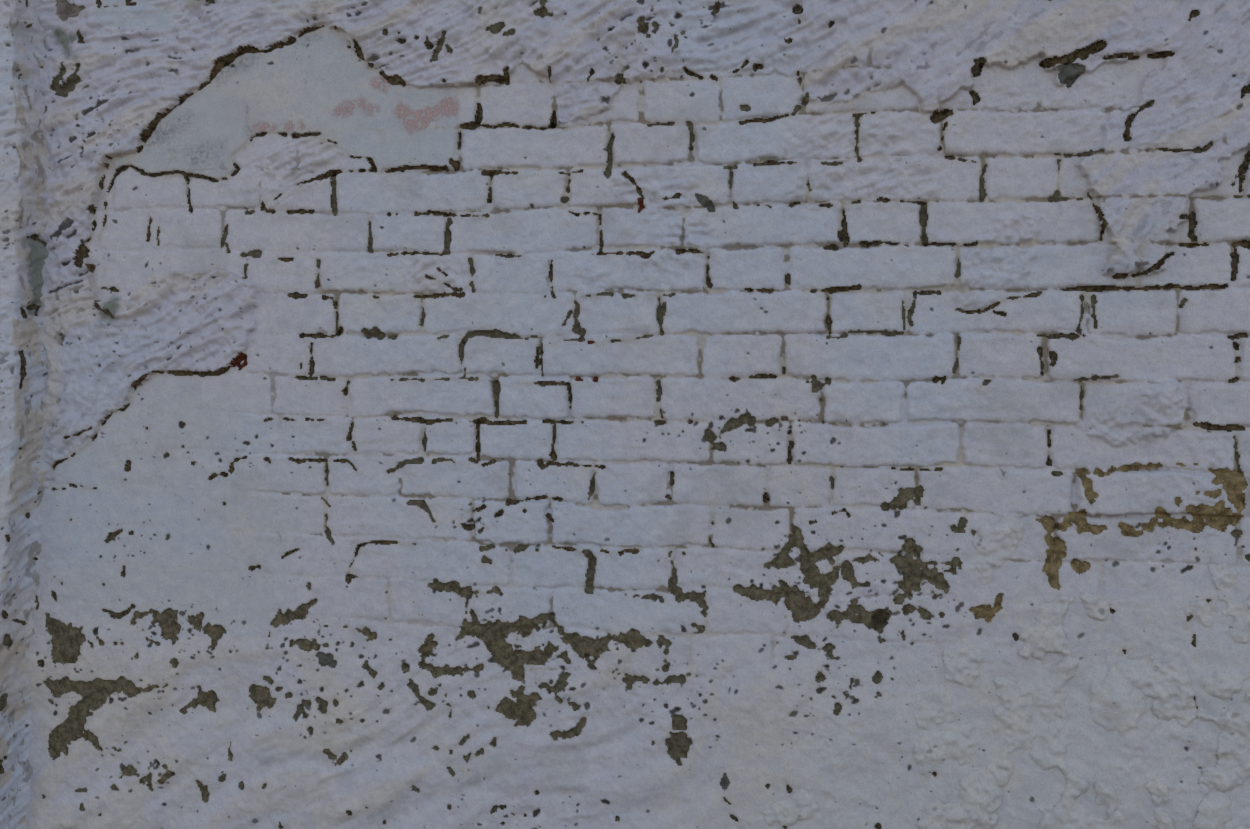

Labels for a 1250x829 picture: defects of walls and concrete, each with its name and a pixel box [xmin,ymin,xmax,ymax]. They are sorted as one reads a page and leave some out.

flaking render [382,28,453,62]
flaking render [387,74,406,87]
flaking render [474,66,510,86]
peeling [950,517,976,535]
peeling [1036,462,1248,590]
peeling [733,523,962,660]
peeling [102,603,226,651]
peeling [401,578,686,741]
peeling [35,582,175,792]
peeling [179,685,220,714]
peeling [651,713,693,766]
peeling [195,742,244,803]